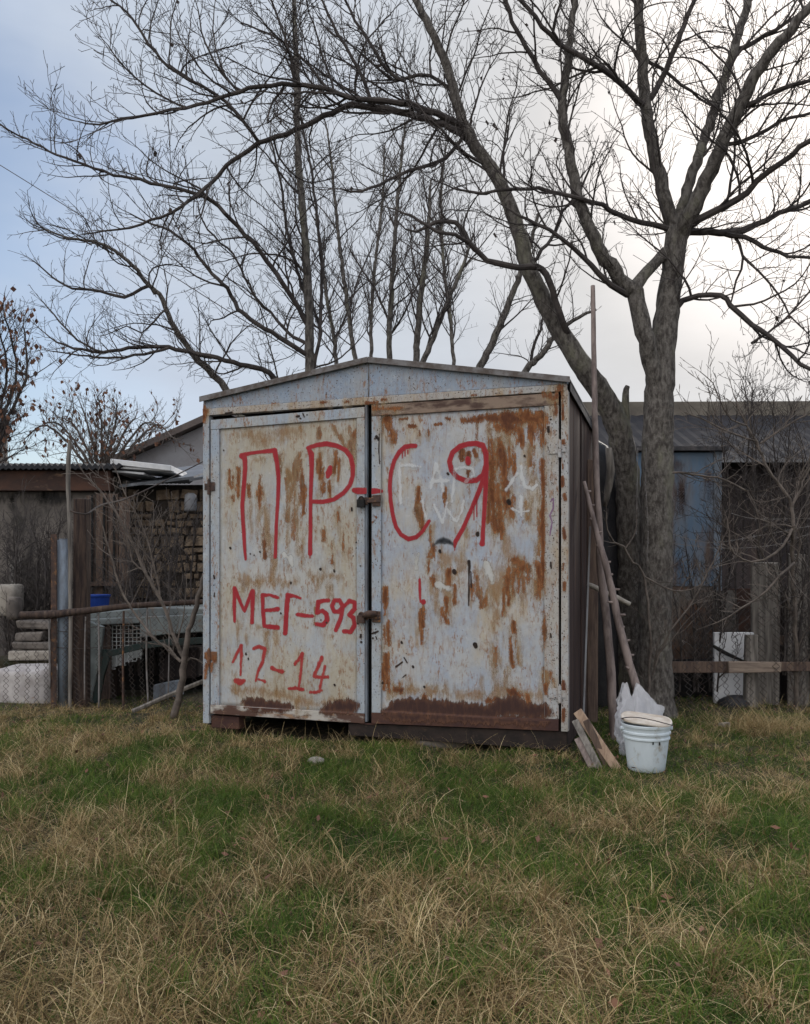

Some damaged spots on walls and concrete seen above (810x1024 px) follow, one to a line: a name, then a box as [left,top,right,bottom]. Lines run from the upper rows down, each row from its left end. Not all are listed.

rust [227,466,264,510]
rust [278,424,357,568]
rust [365,384,565,669]
rust [242,696,294,713]
rust [320,698,360,716]
rust [379,586,555,728]